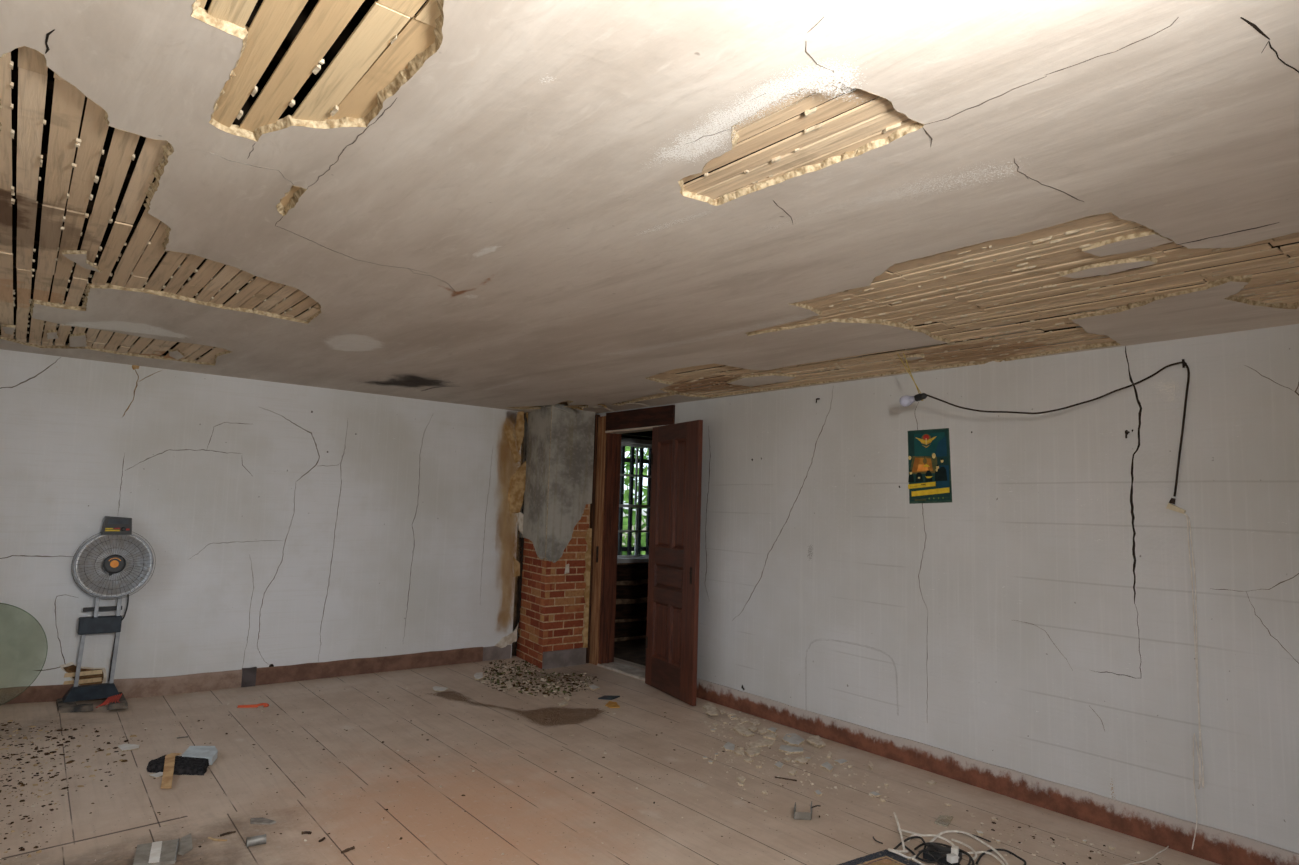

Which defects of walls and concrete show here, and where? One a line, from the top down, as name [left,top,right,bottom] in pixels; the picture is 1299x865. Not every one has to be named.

spalling [0,46,321,370]
spalling [191,0,444,142]
spalling [678,72,925,206]
crack [1014,159,1084,202]
crack [923,17,1179,144]
crack [1241,17,1299,73]
spalling [611,212,1299,406]
crack [118,407,348,668]
peeling [495,625,518,648]
crack [515,496,524,656]
peeling [500,400,588,574]
crack [1015,346,1142,678]